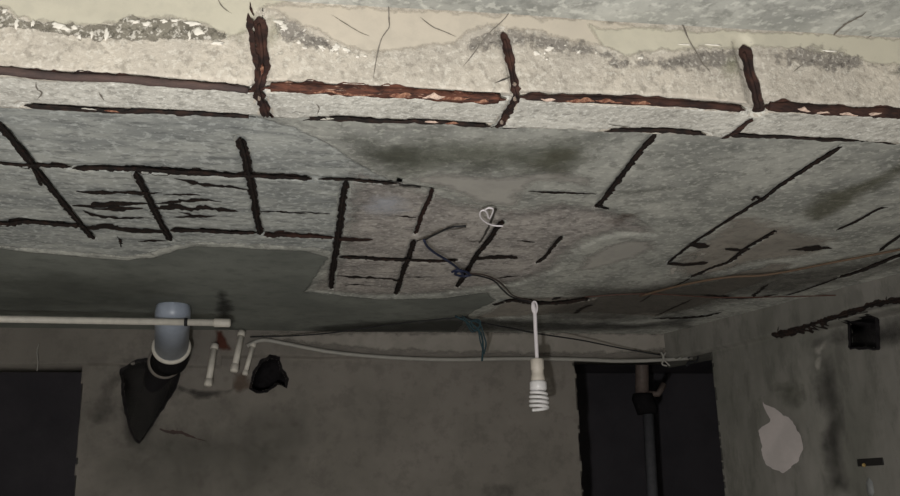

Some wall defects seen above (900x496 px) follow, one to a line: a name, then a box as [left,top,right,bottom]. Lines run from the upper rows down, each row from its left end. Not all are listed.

crack [332,6,390,78]
spalling [0,0,900,295]
water stain [370,148,572,167]
spalling [478,297,595,318]
flaking render [758,403,803,473]